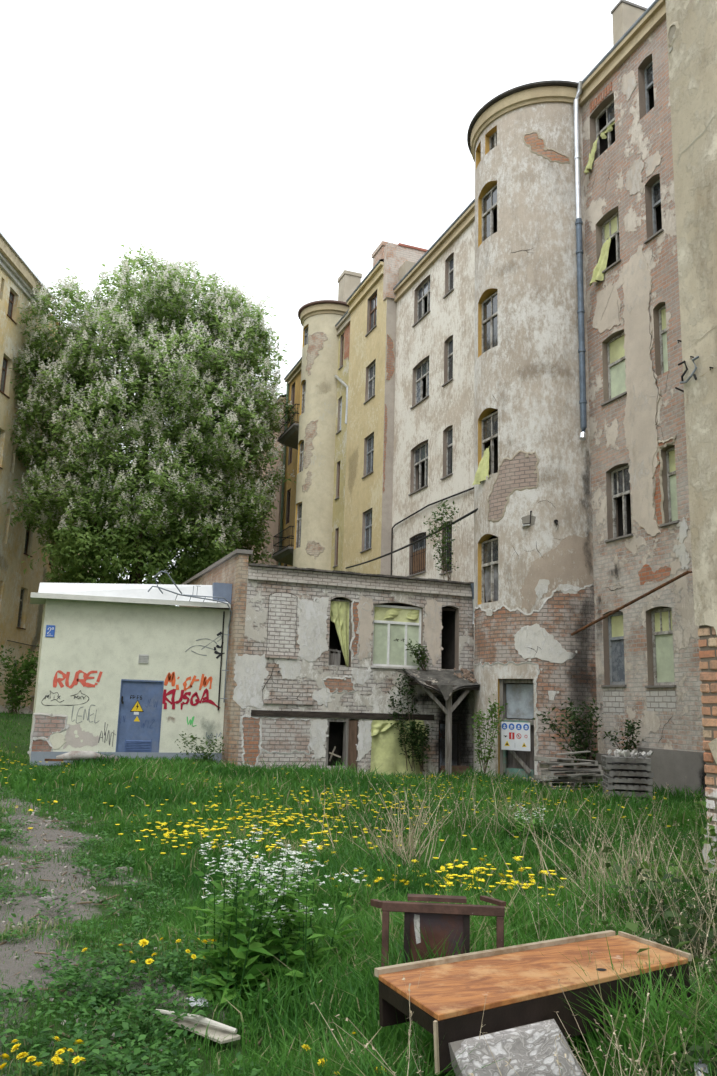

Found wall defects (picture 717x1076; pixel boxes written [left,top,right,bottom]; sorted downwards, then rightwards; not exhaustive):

flaking render [523,131,570,164]
flaking render [592,245,690,585]
crack [649,294,669,440]
flaking render [487,450,539,523]
flaking render [27,713,99,757]
flaking render [233,597,329,768]
flaking render [310,595,374,706]
flaking render [356,721,372,761]
flaking render [474,532,598,779]
flaking render [708,738,717,764]